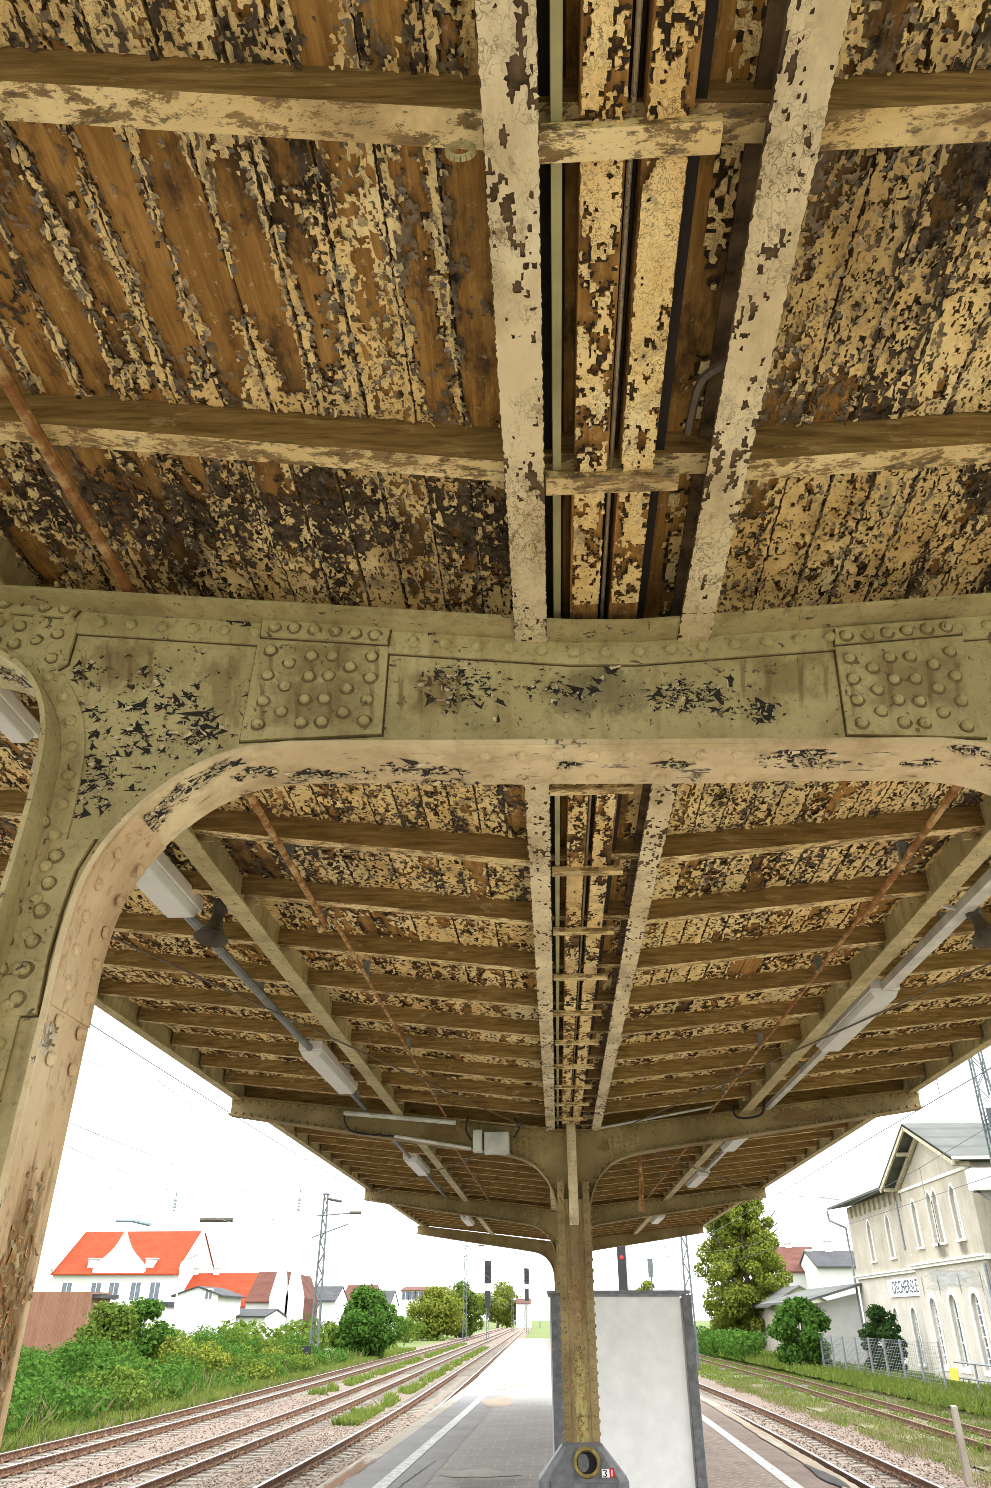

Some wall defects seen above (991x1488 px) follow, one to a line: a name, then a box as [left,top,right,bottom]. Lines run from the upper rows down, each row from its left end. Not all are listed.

peeling [0,0,548,642]
peeling [572,0,991,641]
peeling [0,817,21,855]
peeling [0,737,39,792]
peeling [68,638,991,1131]